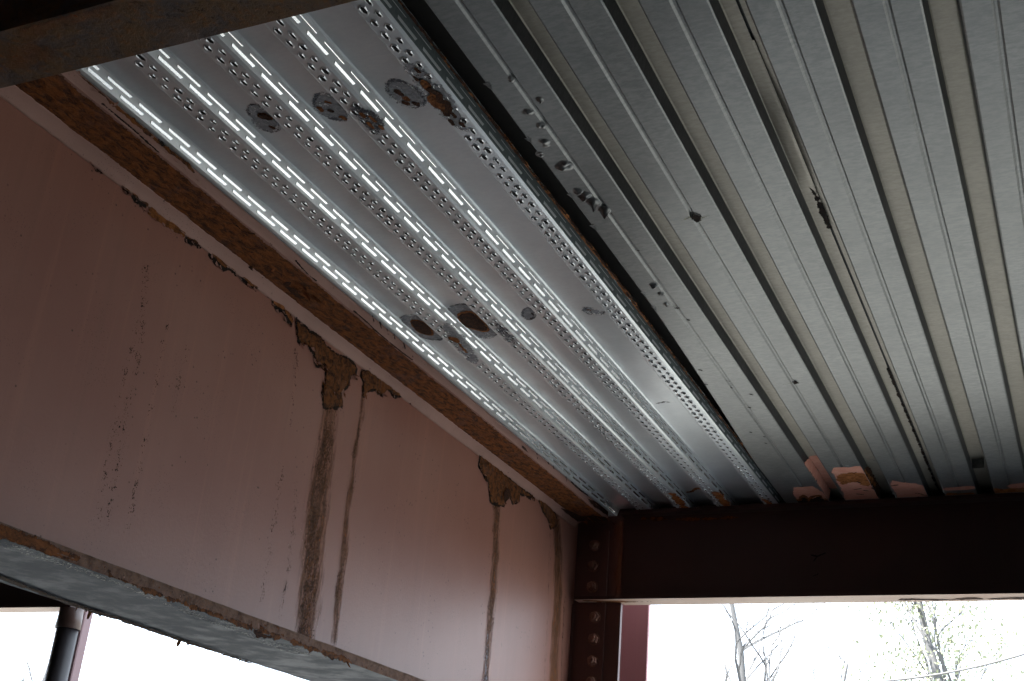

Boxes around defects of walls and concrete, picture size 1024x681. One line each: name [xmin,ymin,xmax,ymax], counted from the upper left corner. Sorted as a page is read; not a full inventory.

rust [0,74,608,681]
rust [385,0,757,465]